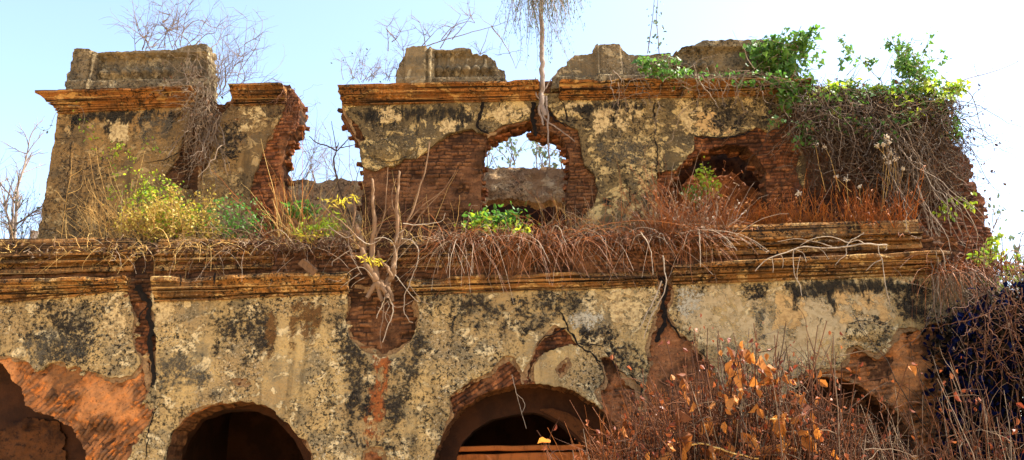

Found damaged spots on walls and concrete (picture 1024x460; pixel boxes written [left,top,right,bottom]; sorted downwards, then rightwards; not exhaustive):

spalling [166,88,301,242]
water stain [355,103,474,135]
spalling [361,99,642,248]
water stain [22,299,105,367]
spalling [0,277,191,460]
crack [134,284,175,459]
spalling [345,284,419,358]
water stain [325,290,649,456]
crack [537,312,643,402]
crack [655,276,682,343]
spalling [441,277,993,460]
water stain [740,277,932,350]